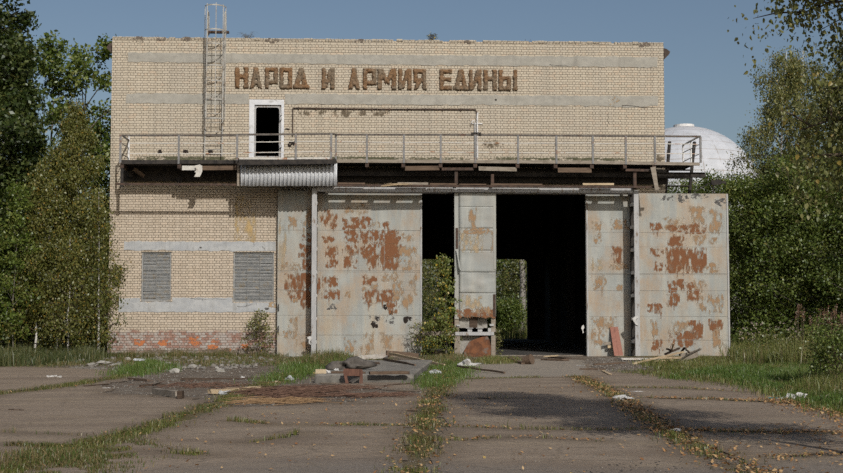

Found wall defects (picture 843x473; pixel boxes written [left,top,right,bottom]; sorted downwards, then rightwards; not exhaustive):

corrosion [459,209,493,253]
corrosion [278,203,417,315]
corrosion [592,247,629,292]
corrosion [647,206,724,354]
corrosion [283,317,311,351]
corrosion [443,295,495,331]
corrosion [591,317,614,345]